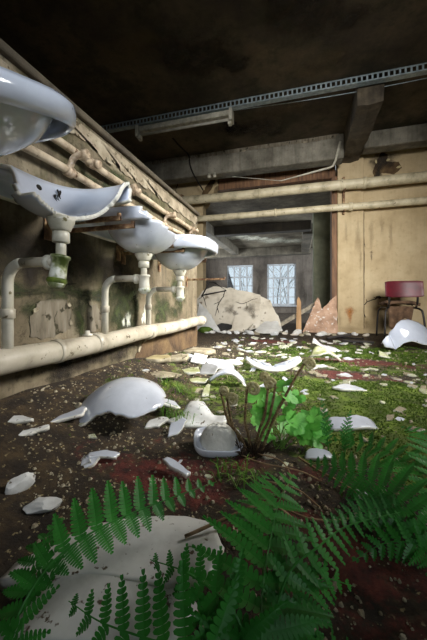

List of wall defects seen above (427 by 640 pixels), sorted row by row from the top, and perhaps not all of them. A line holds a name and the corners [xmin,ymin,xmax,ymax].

peeling [70,120,197,224]
flaking render [373,152,402,177]
peeling [29,299,73,339]